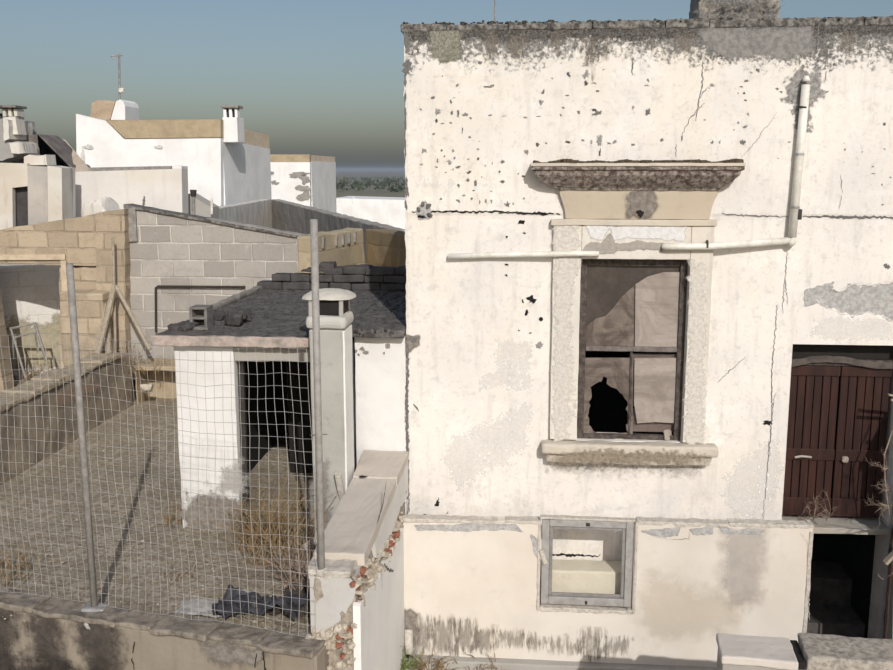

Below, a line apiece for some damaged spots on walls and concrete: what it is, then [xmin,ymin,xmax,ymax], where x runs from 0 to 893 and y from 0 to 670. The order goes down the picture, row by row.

damp [405,31,431,76]
damp [447,0,893,71]
crack [675,63,708,154]
flaking render [776,66,829,133]
flaking render [289,172,312,201]
flaking render [804,281,893,323]
crack [762,253,788,520]
damp [404,609,419,646]